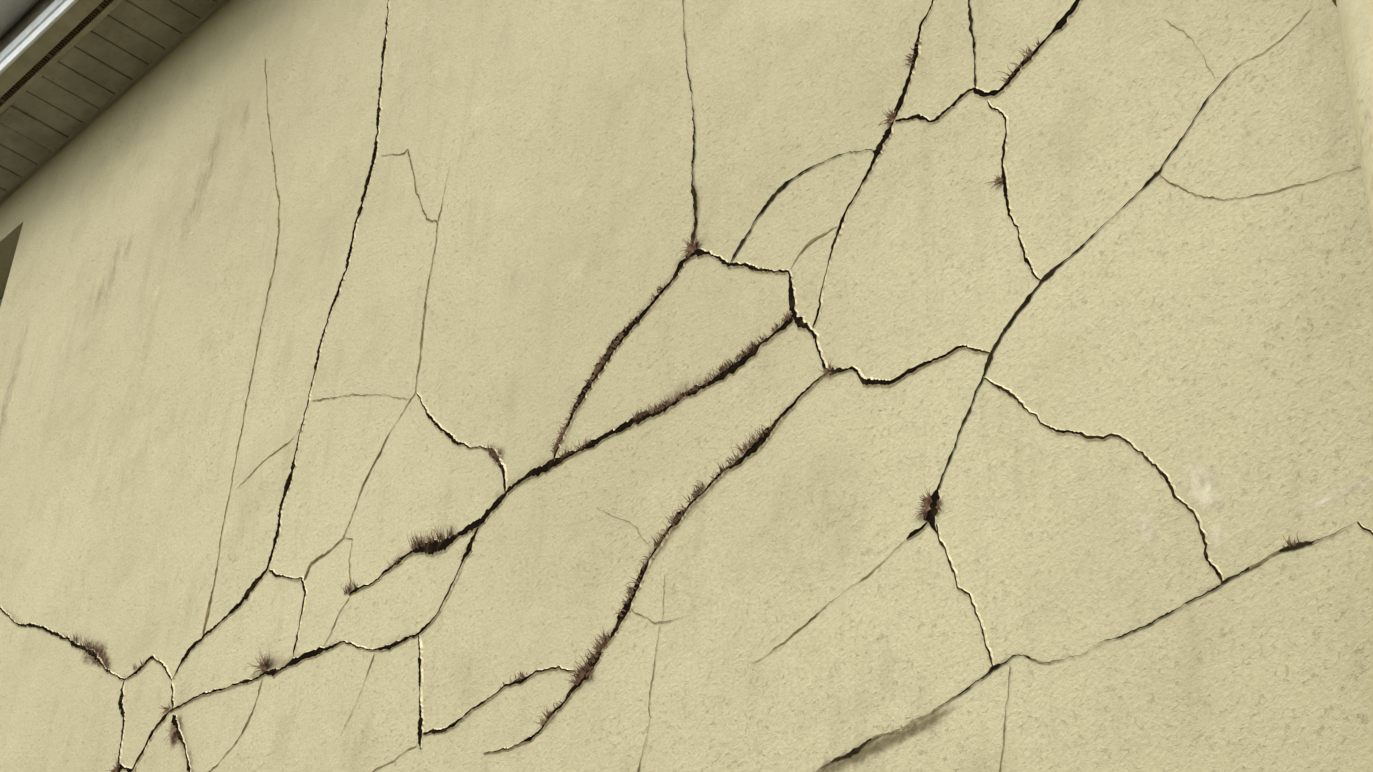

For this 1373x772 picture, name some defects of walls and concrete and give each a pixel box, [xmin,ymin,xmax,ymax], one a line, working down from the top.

crack [0,0,825,772]
crack [676,0,1361,772]
crack [1357,521,1373,537]